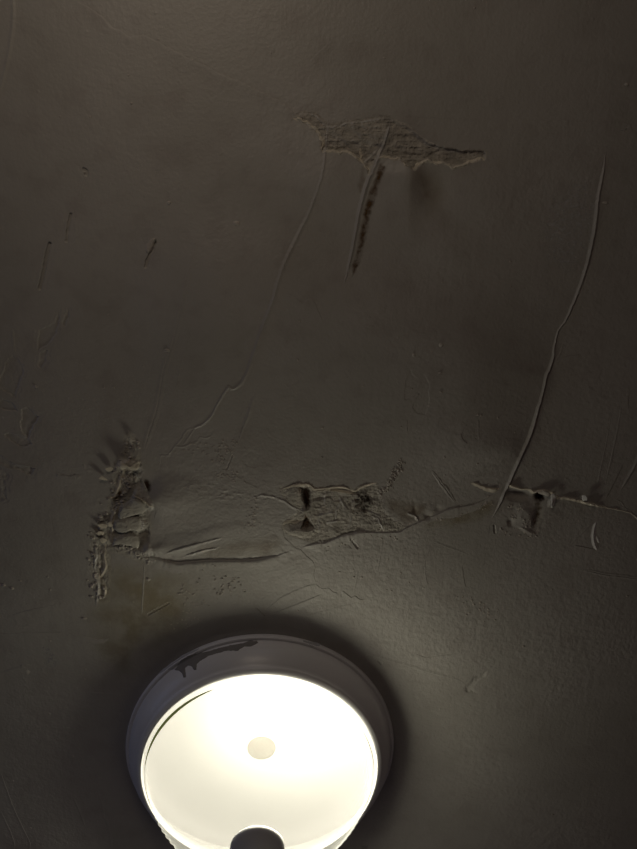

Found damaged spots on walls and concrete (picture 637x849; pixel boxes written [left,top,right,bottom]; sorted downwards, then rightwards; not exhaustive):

crack [341,117,392,294]
crack [471,150,606,523]
crack [141,537,293,576]
spalling [257,482,451,554]
spalling [499,480,637,557]